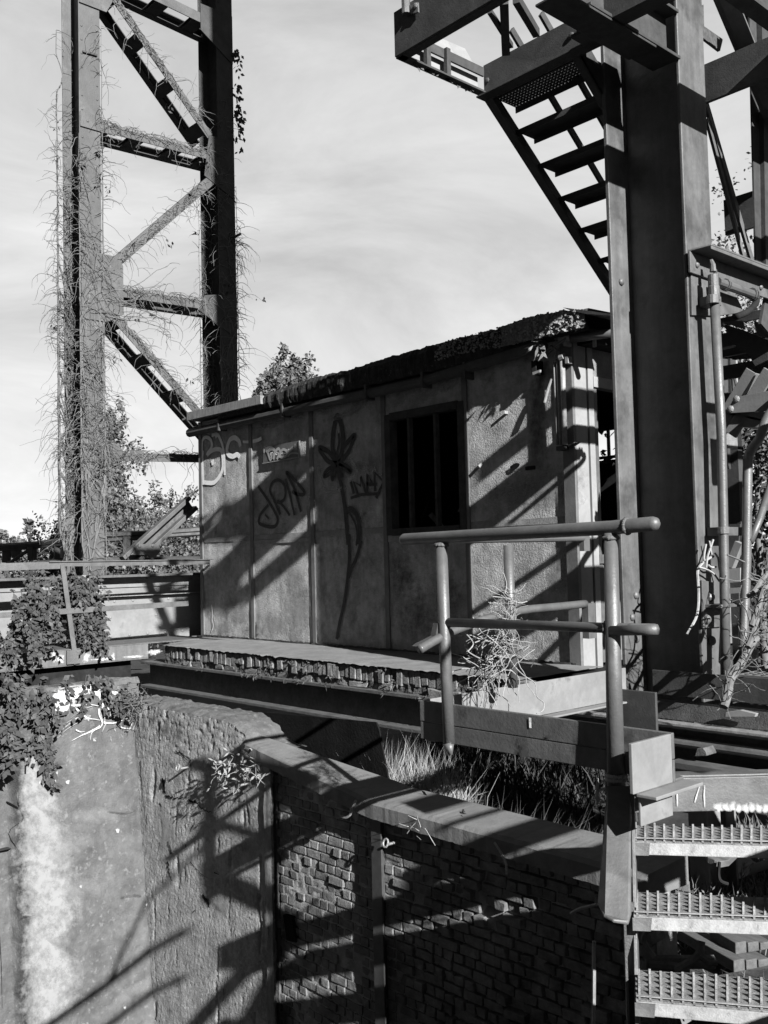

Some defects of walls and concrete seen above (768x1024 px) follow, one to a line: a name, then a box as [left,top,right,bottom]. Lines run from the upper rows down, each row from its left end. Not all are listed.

water stain [22,756,78,1024]